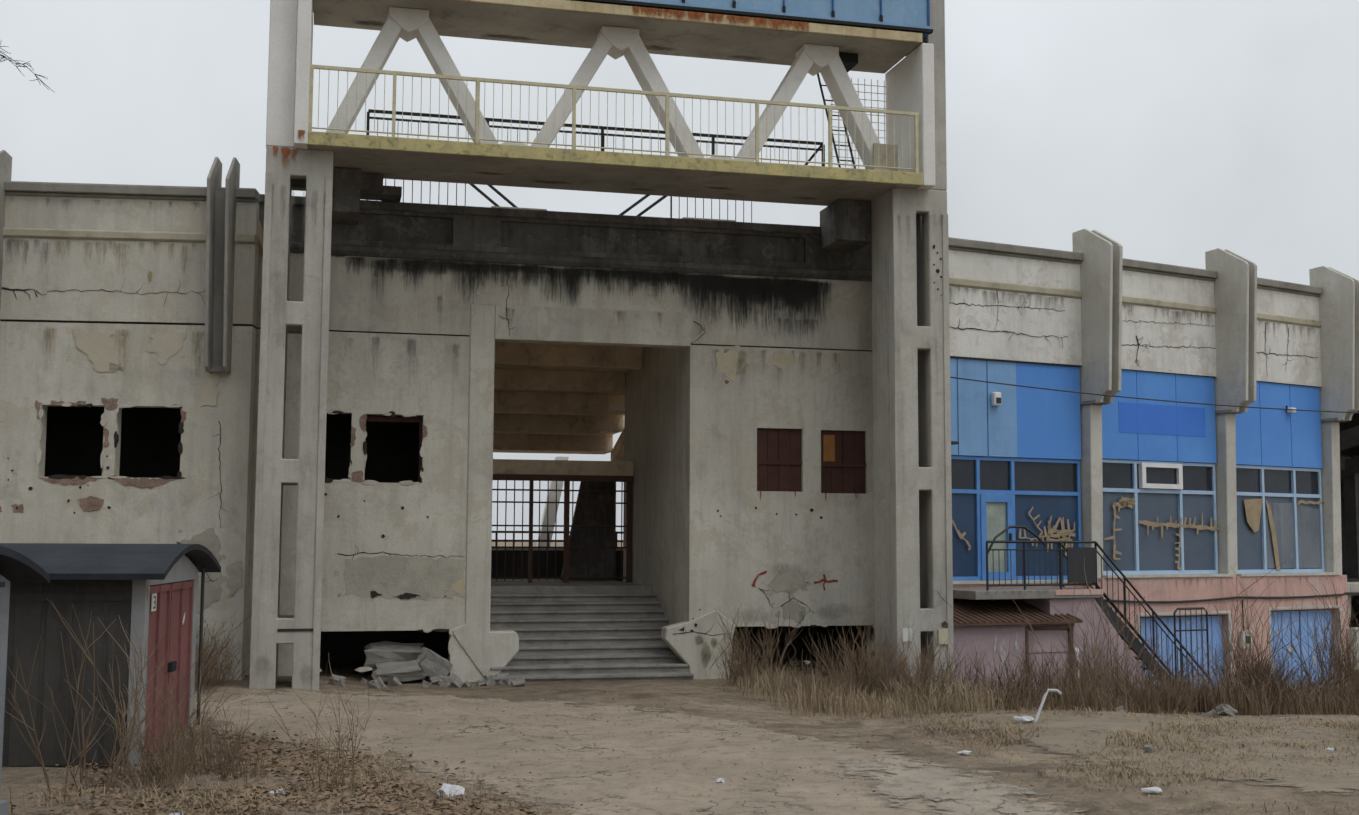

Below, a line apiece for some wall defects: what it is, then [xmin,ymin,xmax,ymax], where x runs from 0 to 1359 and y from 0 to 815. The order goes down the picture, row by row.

corrosion [632,6,809,31]
crack [1,276,205,304]
water stain [332,255,831,323]
spalling [28,398,187,514]
spalling [419,628,453,654]